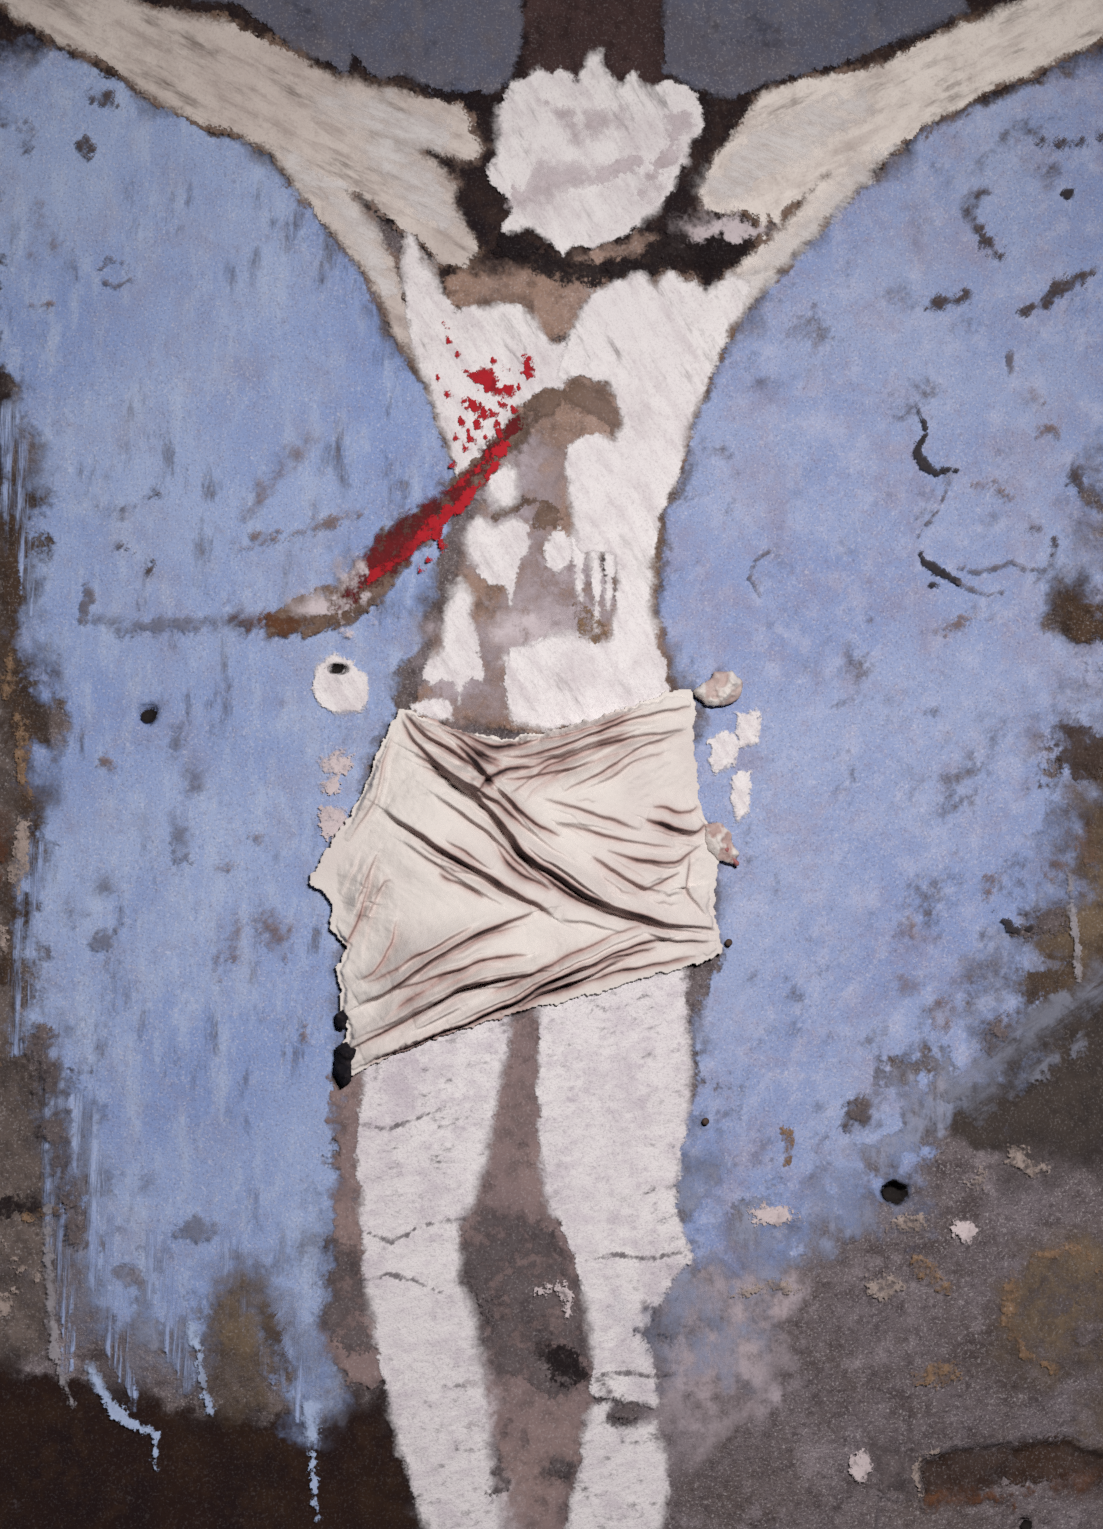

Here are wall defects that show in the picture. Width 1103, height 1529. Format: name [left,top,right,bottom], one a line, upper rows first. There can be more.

crack [913,405,1047,595]
peeling [838,1093,872,1132]
spalling [780,1125,795,1167]
spalling [1004,1144,1051,1178]
spalling [746,1200,806,1227]
spalling [886,1212,927,1232]
spalling [950,1219,978,1245]
spalling [864,1254,953,1302]
peeling [633,1295,682,1350]
spalling [846,1433,1103,1508]